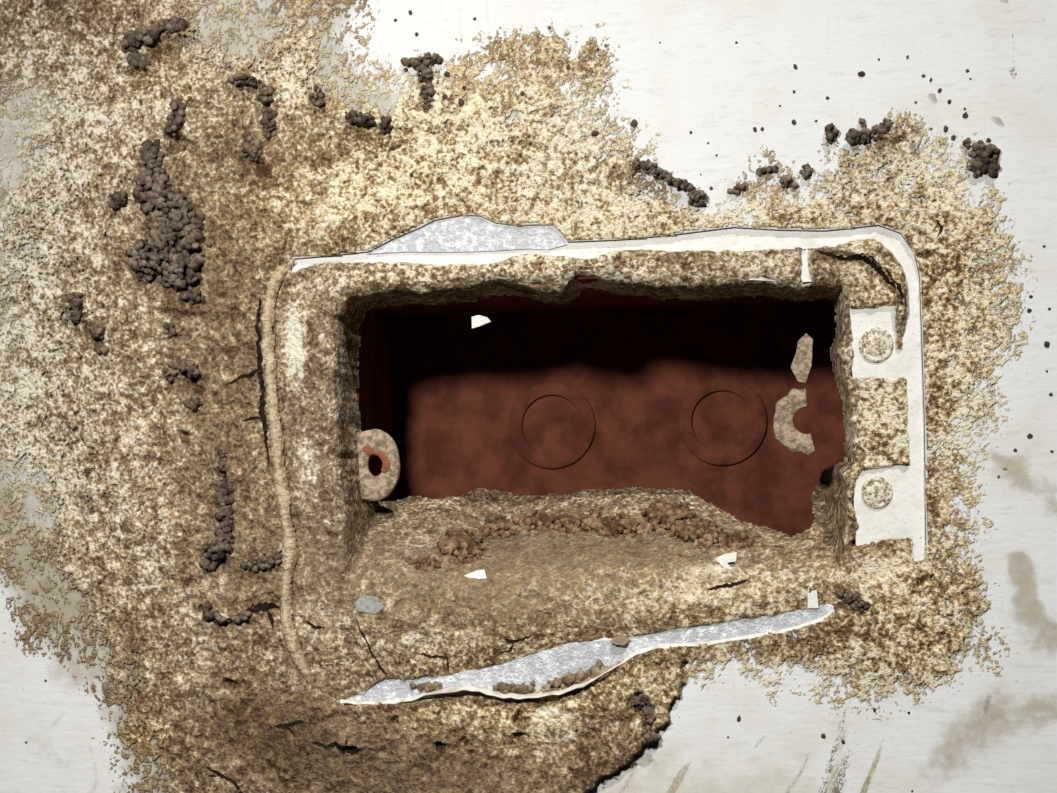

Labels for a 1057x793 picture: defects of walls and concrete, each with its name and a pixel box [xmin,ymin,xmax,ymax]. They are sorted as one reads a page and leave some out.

peeling [472,315,491,328]
peeling [340,582,835,705]